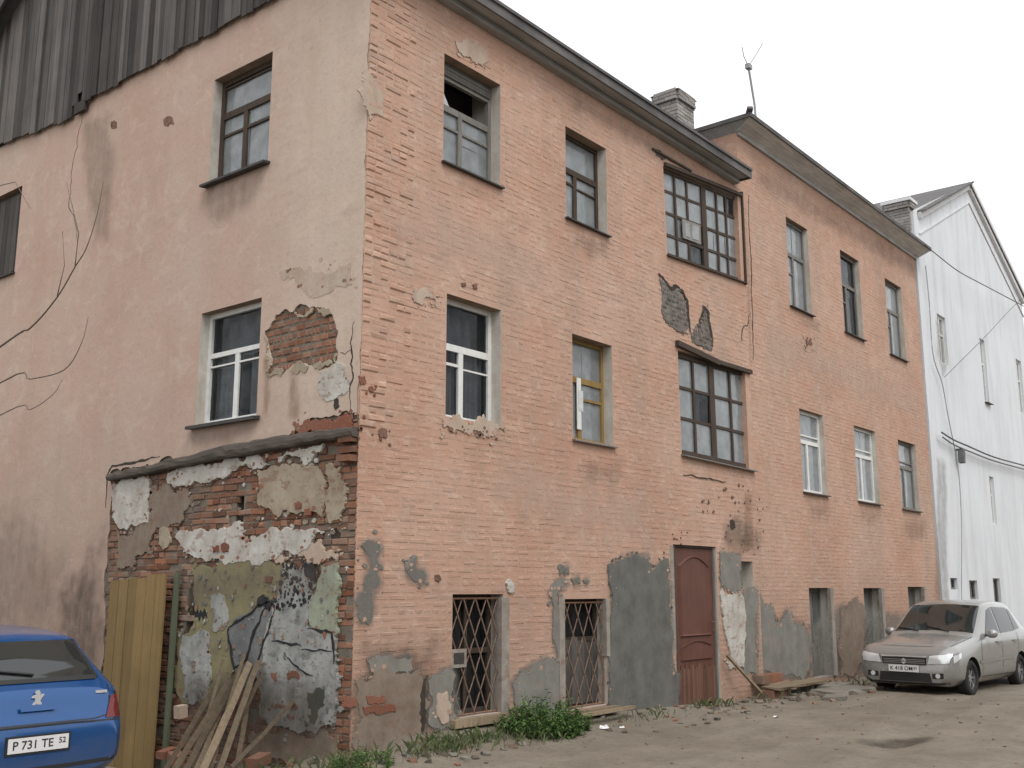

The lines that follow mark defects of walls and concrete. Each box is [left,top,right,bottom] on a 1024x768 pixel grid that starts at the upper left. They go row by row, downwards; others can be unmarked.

spalling [659,273,713,351]
crack [340,322,354,410]
peeling [440,416,506,446]
flaking render [102,307,462,766]
spalling [701,483,811,647]